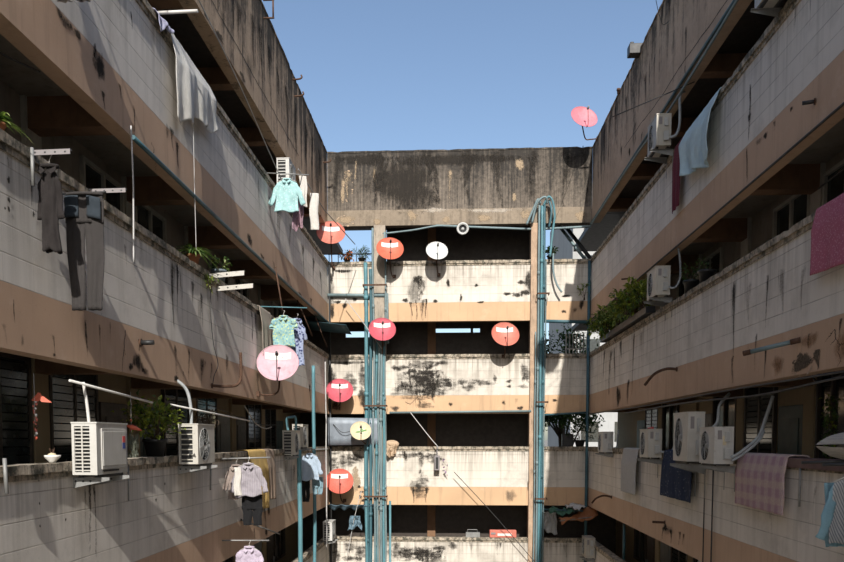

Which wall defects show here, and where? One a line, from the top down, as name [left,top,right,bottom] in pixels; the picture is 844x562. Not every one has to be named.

water stain [93,45,104,79]
water stain [248,14,321,189]
water stain [333,151,538,212]
water stain [403,276,437,316]
water stain [504,266,531,297]
water stain [129,339,147,374]
water stain [392,361,497,408]
water stain [400,451,442,503]
water stain [393,542,456,562]